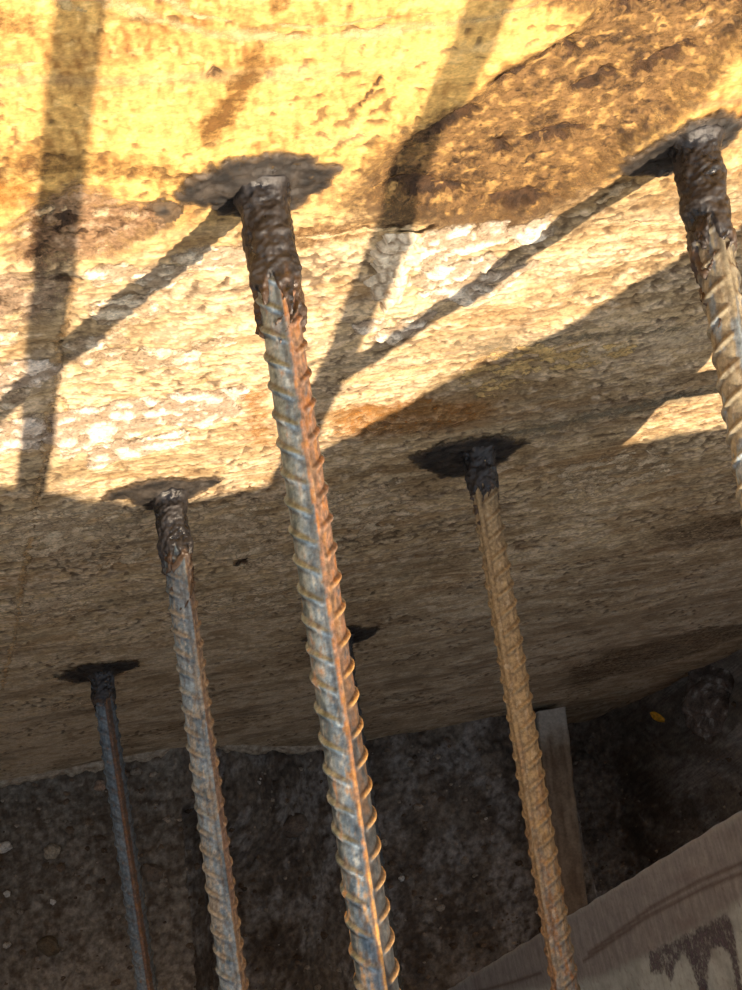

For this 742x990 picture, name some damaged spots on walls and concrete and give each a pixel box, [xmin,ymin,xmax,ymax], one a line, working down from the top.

water stain [332,13,437,38]
water stain [467,29,595,104]
water stain [0,154,184,183]
water stain [294,87,671,248]
rust [337,398,489,436]